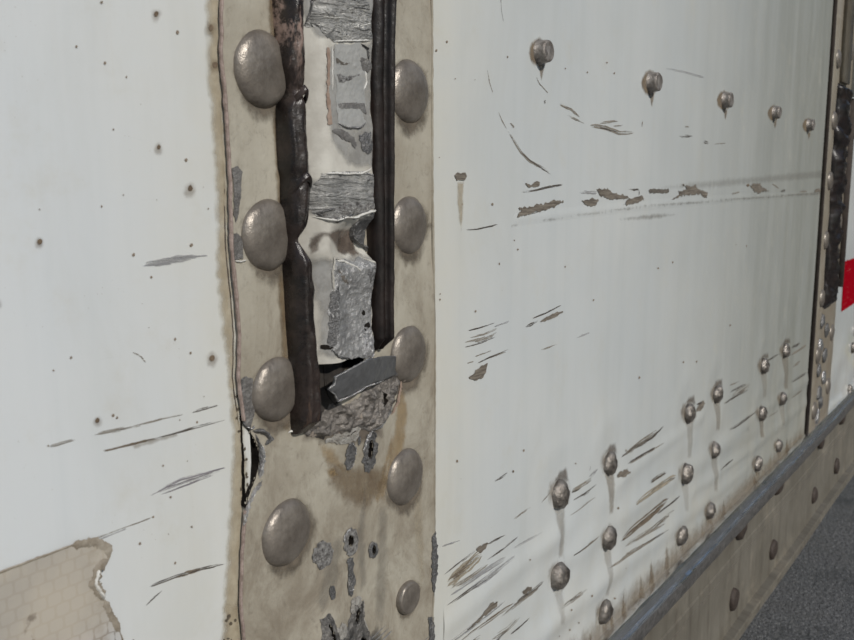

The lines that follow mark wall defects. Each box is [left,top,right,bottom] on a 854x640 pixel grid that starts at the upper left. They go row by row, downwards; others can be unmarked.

peeling [304,0,373,154]
peeling [309,168,376,223]
peeling [526,181,561,192]
peeling [582,184,708,207]
peeling [733,183,784,194]
peeling [518,200,564,217]
peeling [320,256,376,360]